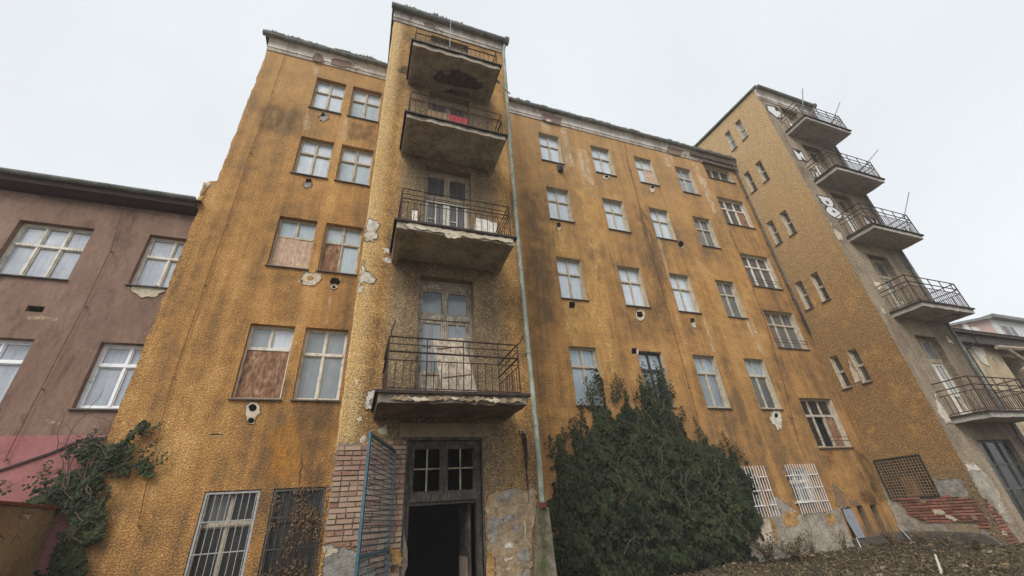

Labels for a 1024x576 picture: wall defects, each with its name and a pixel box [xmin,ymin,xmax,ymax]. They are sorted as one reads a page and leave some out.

peeling [363,217,392,263]
flaking render [127,284,166,299]
flaking render [298,271,340,290]
peeling [358,260,378,294]
peeling [345,372,376,422]
spalling [391,394,522,404]
flaking render [319,424,408,576]
flaking render [484,484,538,576]
flaking render [750,482,860,563]
flaking render [880,462,1021,546]